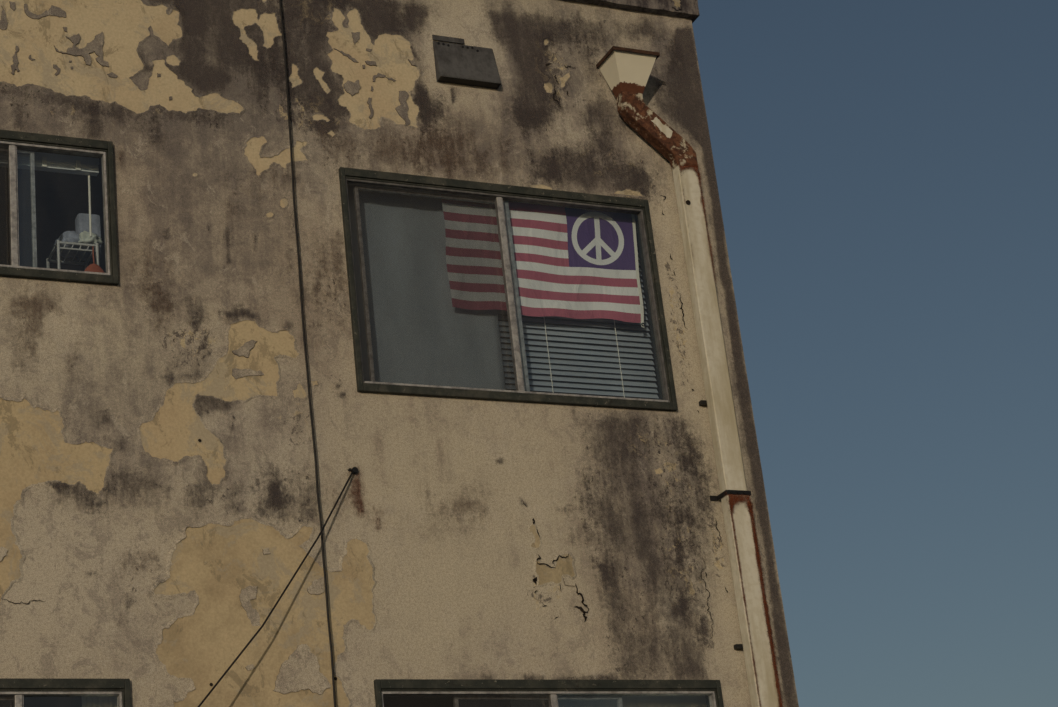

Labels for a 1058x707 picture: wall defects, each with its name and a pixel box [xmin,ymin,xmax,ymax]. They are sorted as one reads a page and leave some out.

peeling [0,0,246,117]
peeling [230,0,285,63]
peeling [288,5,422,133]
water stain [487,10,654,135]
peeling [242,134,311,178]
water stain [531,100,658,202]
peeling [137,318,319,486]
peeling [0,394,116,613]
peeling [150,515,378,707]
crack [523,501,589,622]
water stain [567,413,709,680]
corrosion [728,494,783,707]